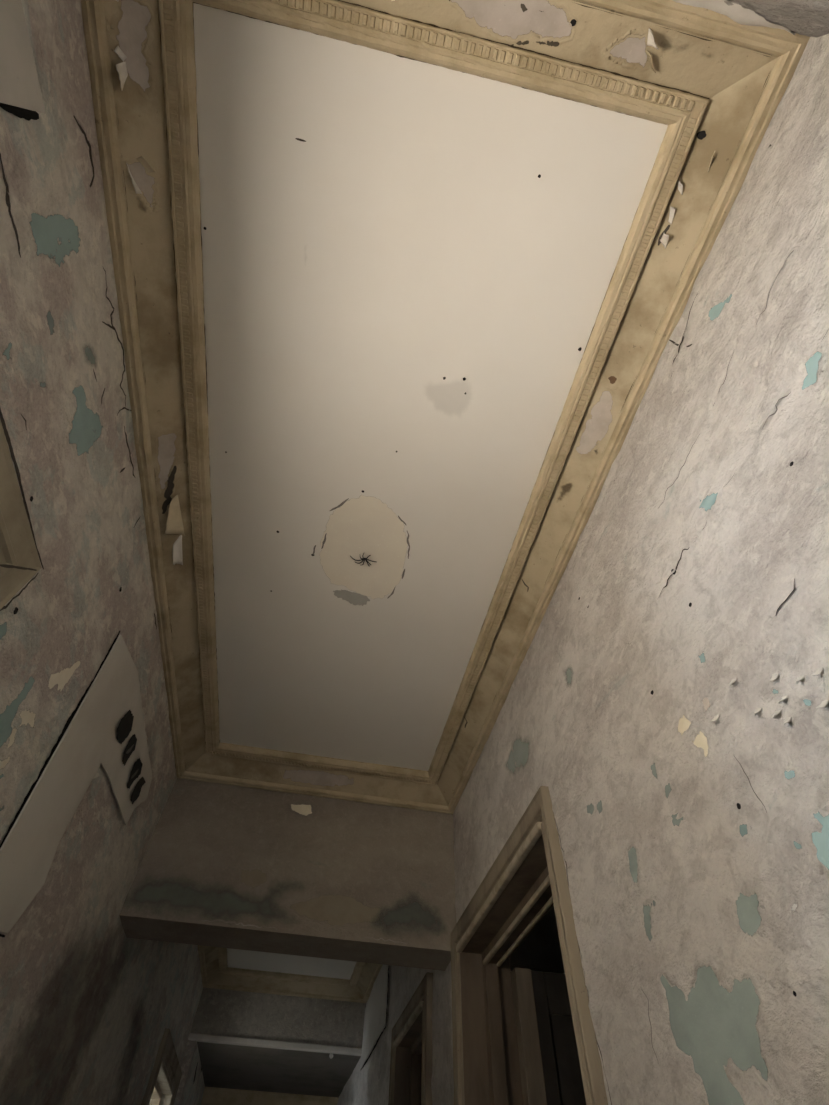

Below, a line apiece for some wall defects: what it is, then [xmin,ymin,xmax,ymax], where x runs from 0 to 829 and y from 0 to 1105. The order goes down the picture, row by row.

peeling [109,0,155,104]
peeling [448,0,578,45]
peeling [600,28,658,73]
crack [74,115,96,189]
crack [0,152,21,258]
crack [93,267,135,477]
peeling [799,344,829,396]
peeling [69,385,103,456]
peeling [562,385,618,482]
crack [658,522,707,598]
peeling [657,956,791,1105]